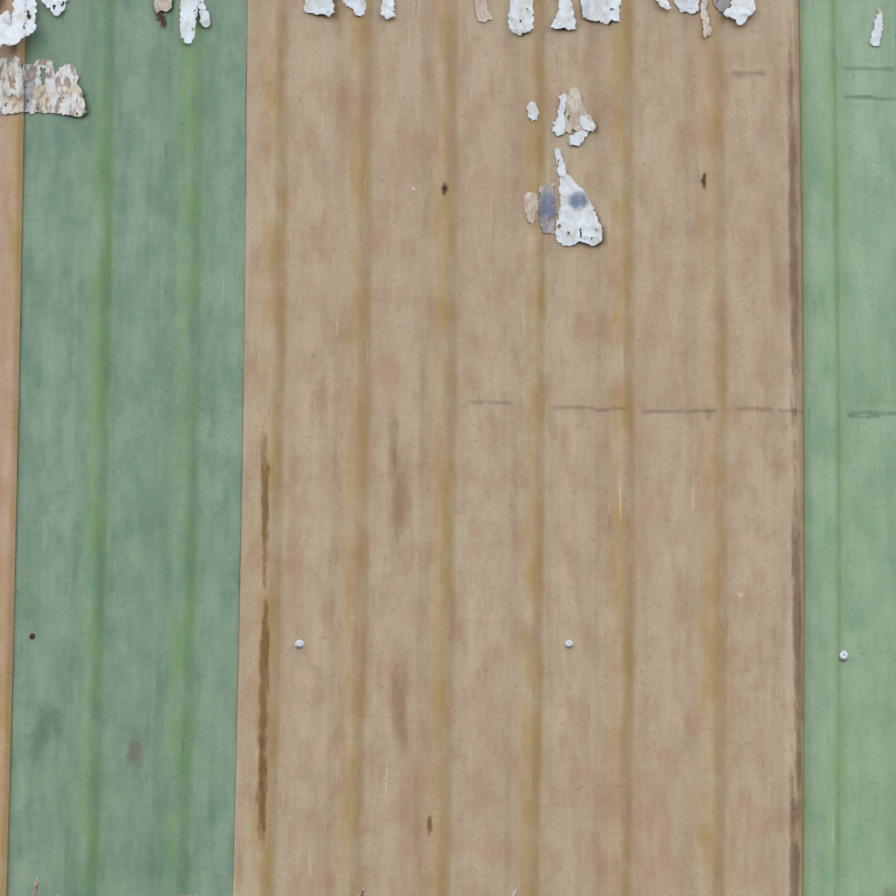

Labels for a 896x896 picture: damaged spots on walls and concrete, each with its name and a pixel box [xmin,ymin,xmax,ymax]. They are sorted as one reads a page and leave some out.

peeling [153,0,210,44]
peeling [304,0,367,17]
peeling [381,0,396,19]
peeling [474,0,492,22]
peeling [508,0,534,35]
peeling [551,0,621,30]
peeling [656,0,756,38]
peeling [870,7,883,46]
peeling [0,0,86,117]
peeling [526,101,539,121]
peeling [552,87,596,146]
peeling [524,148,602,246]